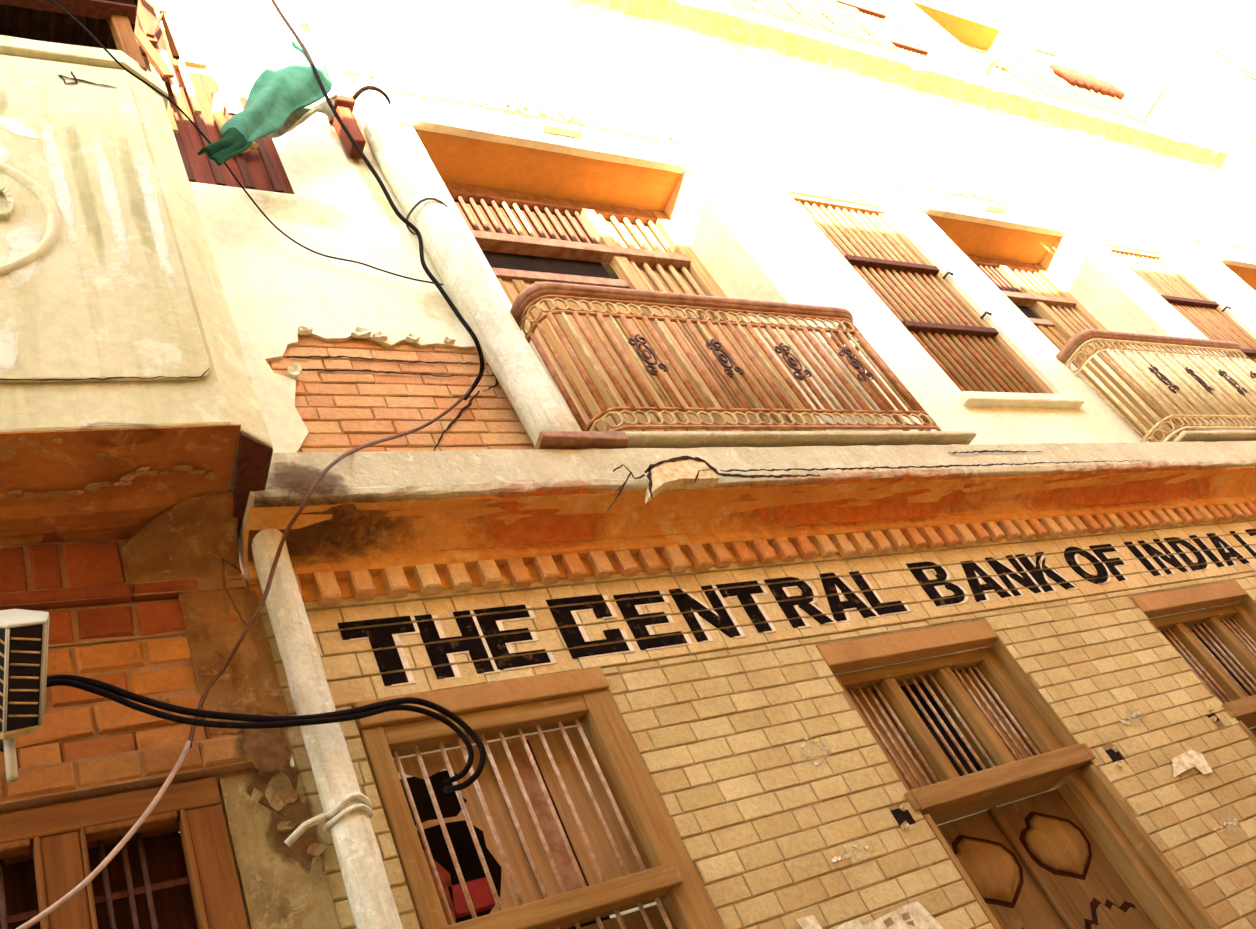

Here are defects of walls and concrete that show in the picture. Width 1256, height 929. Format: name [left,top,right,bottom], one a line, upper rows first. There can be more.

spalling [267,326,535,452]
damp [248,530,262,564]
damp [254,463,404,567]
crack [607,450,1145,512]